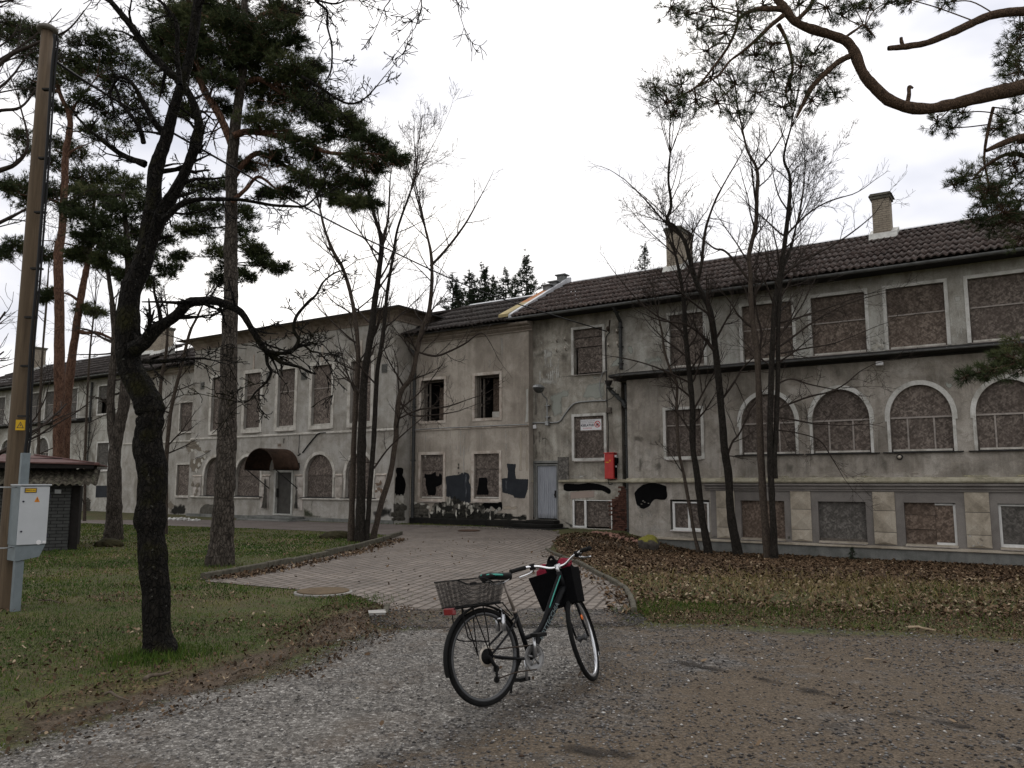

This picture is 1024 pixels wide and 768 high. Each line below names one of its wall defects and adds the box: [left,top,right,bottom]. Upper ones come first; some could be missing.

flaking render [186,441,213,514]
flaking render [608,486,627,531]